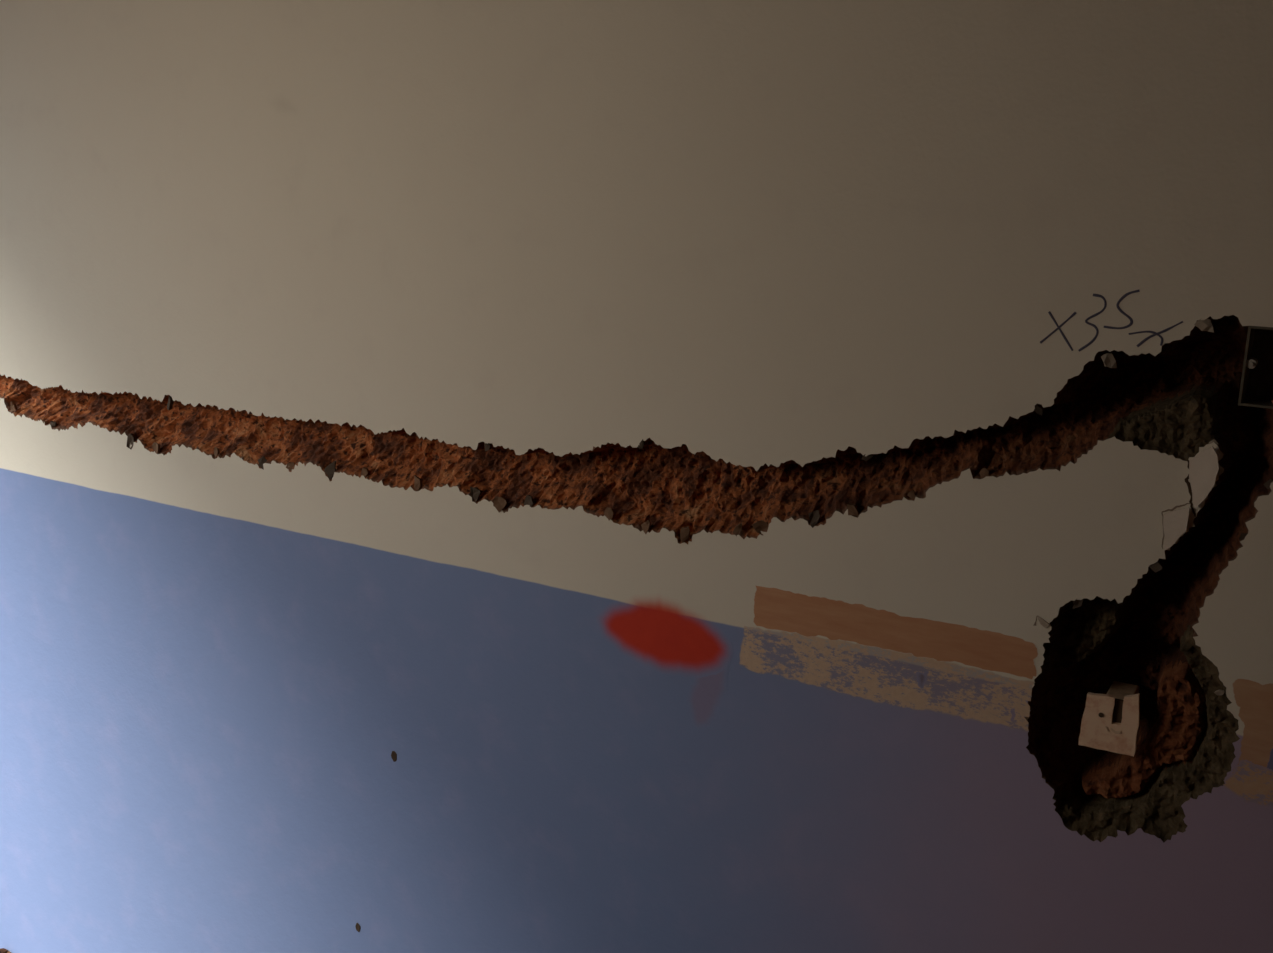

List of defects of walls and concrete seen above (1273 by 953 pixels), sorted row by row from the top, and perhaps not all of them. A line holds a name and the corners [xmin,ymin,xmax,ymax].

crack [1161,446,1219,551]
spalling [739,585,1273,843]